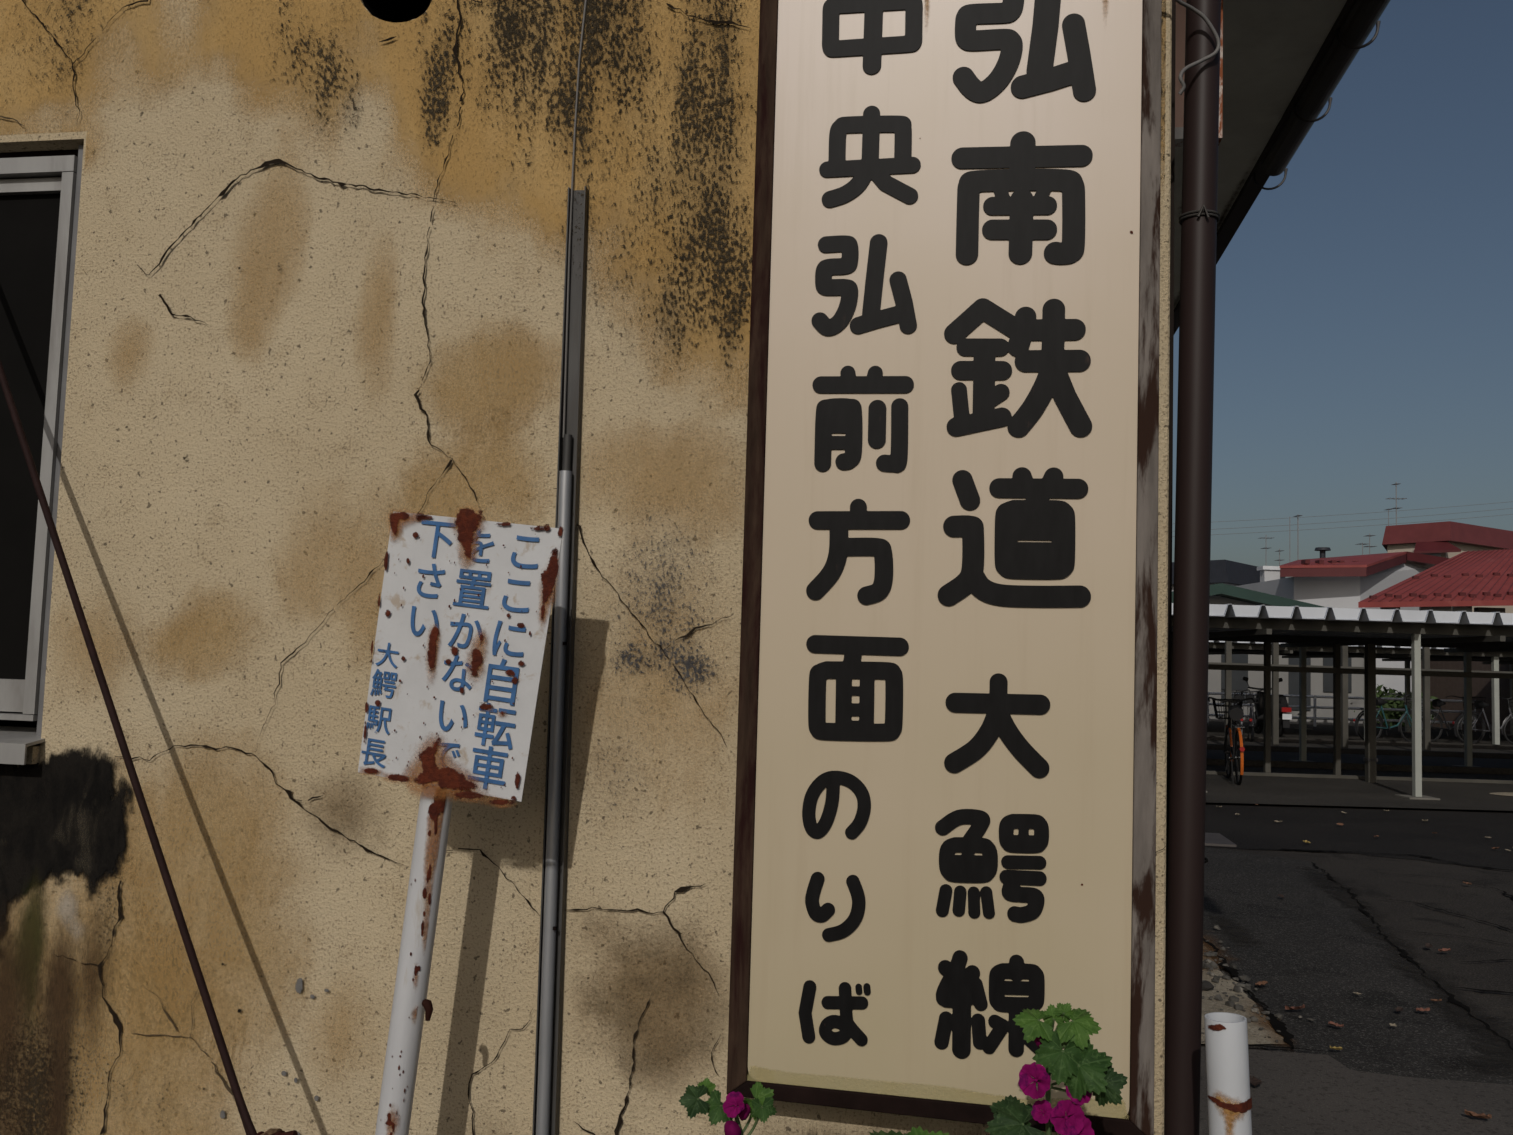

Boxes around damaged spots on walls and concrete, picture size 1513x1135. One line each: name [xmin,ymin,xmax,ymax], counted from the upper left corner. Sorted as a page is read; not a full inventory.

crack [142,0,488,520]
damp [0,0,760,383]
crack [115,559,405,866]
crack [573,514,730,747]
damp [0,747,262,1135]
crack [57,869,234,1135]
crack [468,1012,531,1135]
crack [446,848,719,995]
crack [575,994,652,1135]